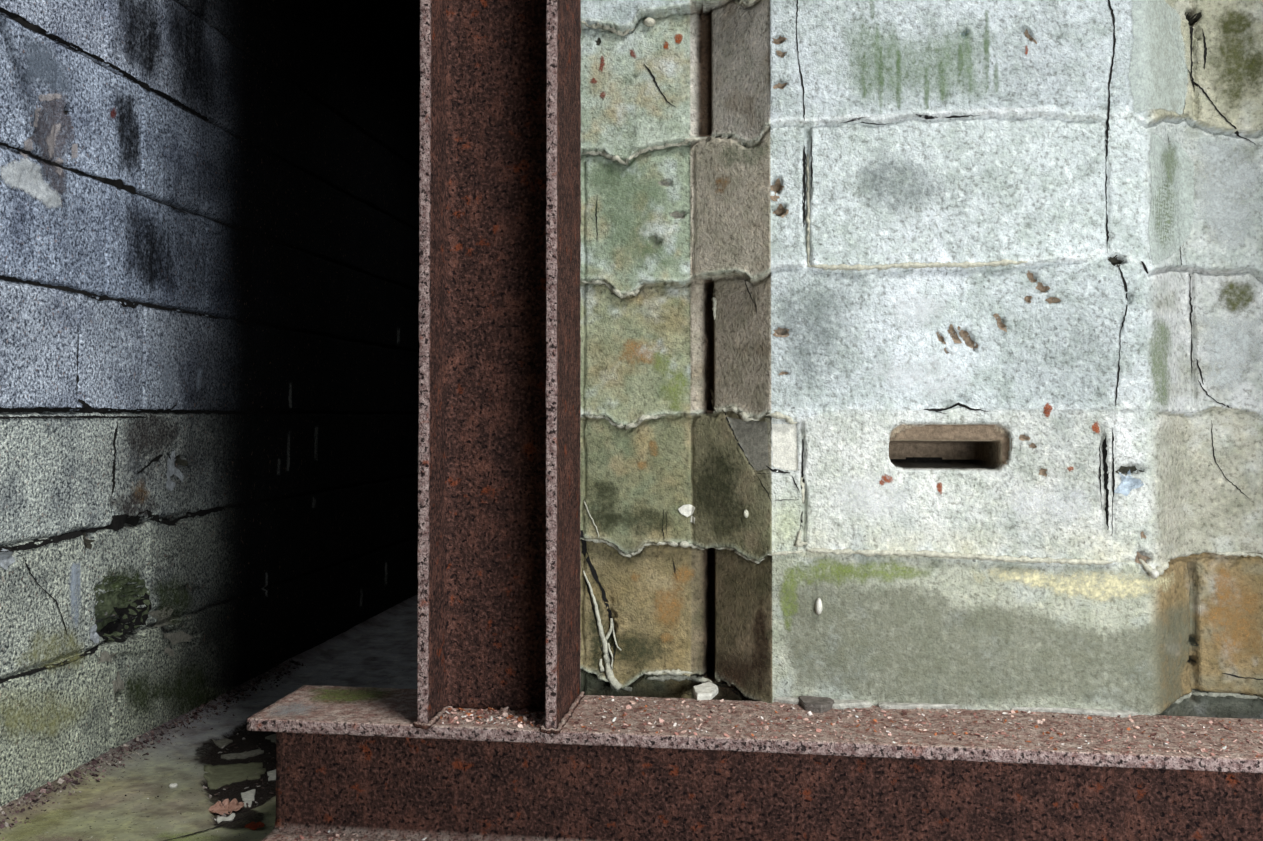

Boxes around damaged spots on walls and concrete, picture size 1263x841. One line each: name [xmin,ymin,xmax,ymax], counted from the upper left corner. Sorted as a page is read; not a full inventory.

peeling [1,94,78,207]
leakage [118,97,139,168]
leakage [120,0,213,115]
spalling [770,178,789,218]
crack [1164,8,1257,152]
crack [0,275,219,319]
crack [1099,0,1148,533]
spalling [727,417,798,471]
crack [0,330,248,684]
peeling [678,504,695,523]
leakage [790,586,1193,709]
rust [440,706,546,728]